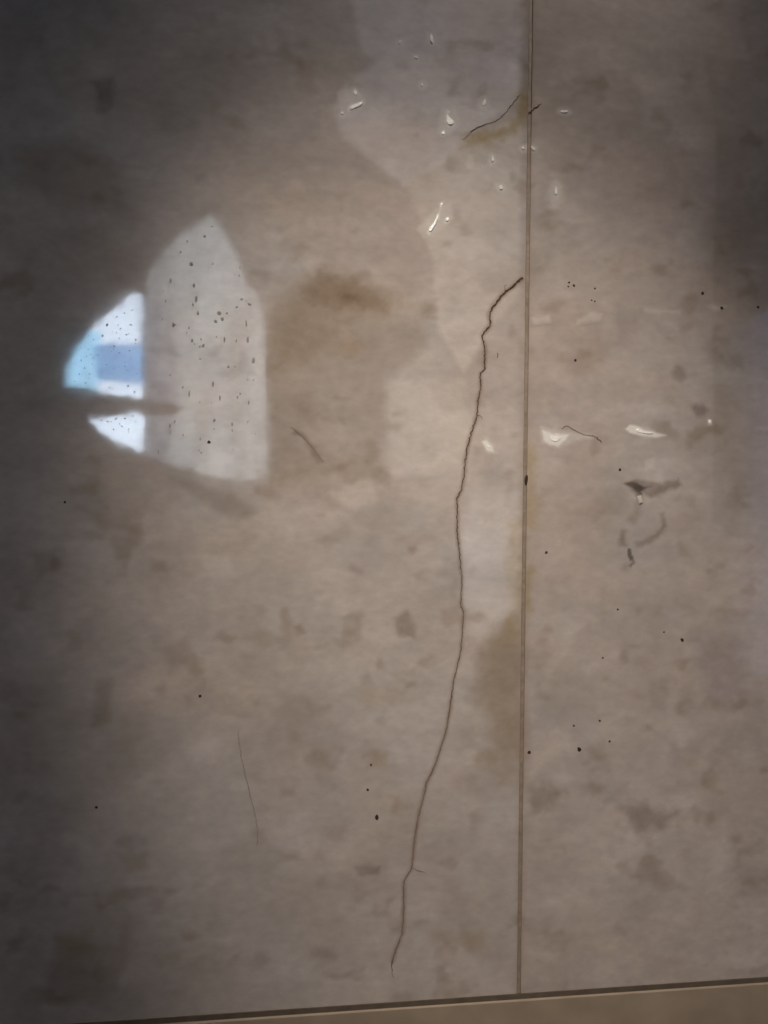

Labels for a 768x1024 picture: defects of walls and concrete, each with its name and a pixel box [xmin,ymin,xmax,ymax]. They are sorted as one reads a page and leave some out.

crack [463,95,541,140]
leakage [257,258,401,438]
crack [388,273,526,978]
leakage [467,605,614,824]